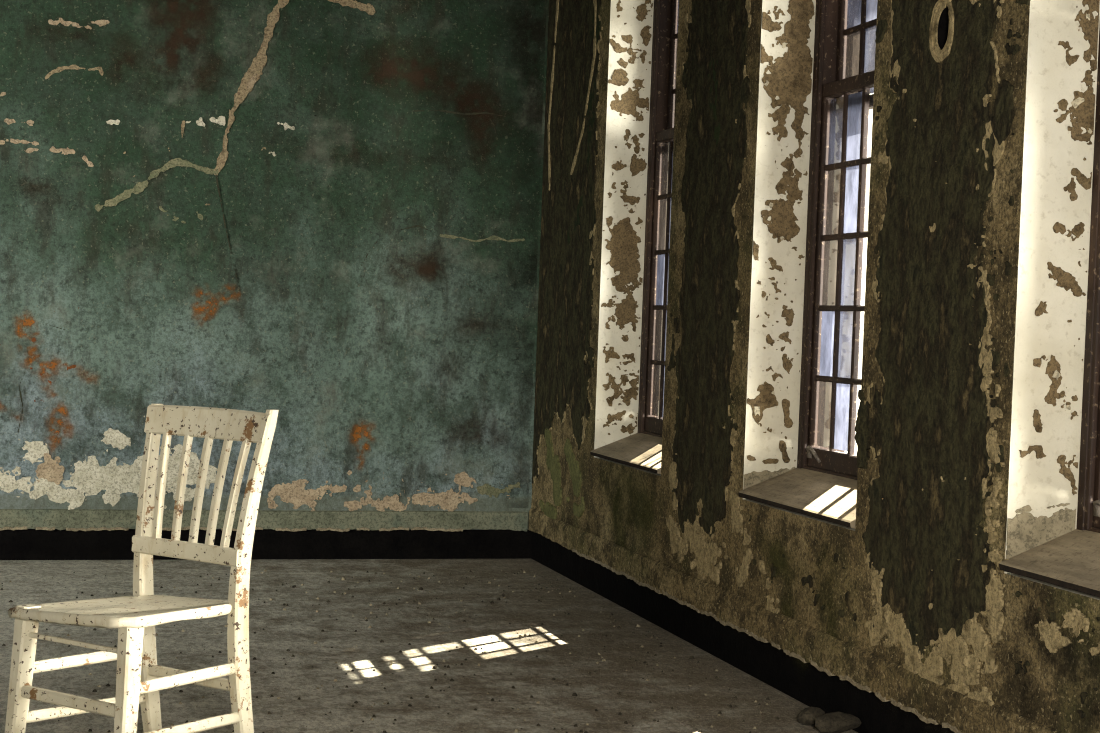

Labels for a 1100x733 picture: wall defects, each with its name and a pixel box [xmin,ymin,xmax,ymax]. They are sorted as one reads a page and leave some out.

peeling [48,18,110,29]
crack [328,0,375,15]
peeling [0,139,94,167]
crack [95,0,289,291]
peeling [1054,0,1100,201]
corrosion [16,314,92,447]
peeling [267,0,653,512]
peeling [666,0,815,614]
peeling [838,0,1078,706]
peeling [1047,222,1087,297]
peeling [0,428,143,510]
peeling [1034,599,1100,656]